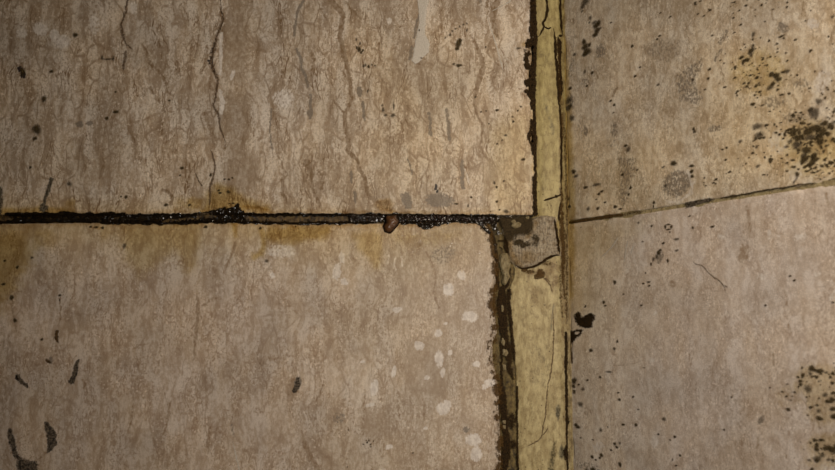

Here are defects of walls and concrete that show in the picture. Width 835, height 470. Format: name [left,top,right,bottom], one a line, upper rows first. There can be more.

crack [196,0,226,207]
leakage [573,0,601,57]
leakage [703,32,835,199]
leakage [0,0,538,470]
spalling [499,214,561,285]
leakage [548,305,595,470]
leakage [781,365,835,420]
leakage [800,438,835,470]